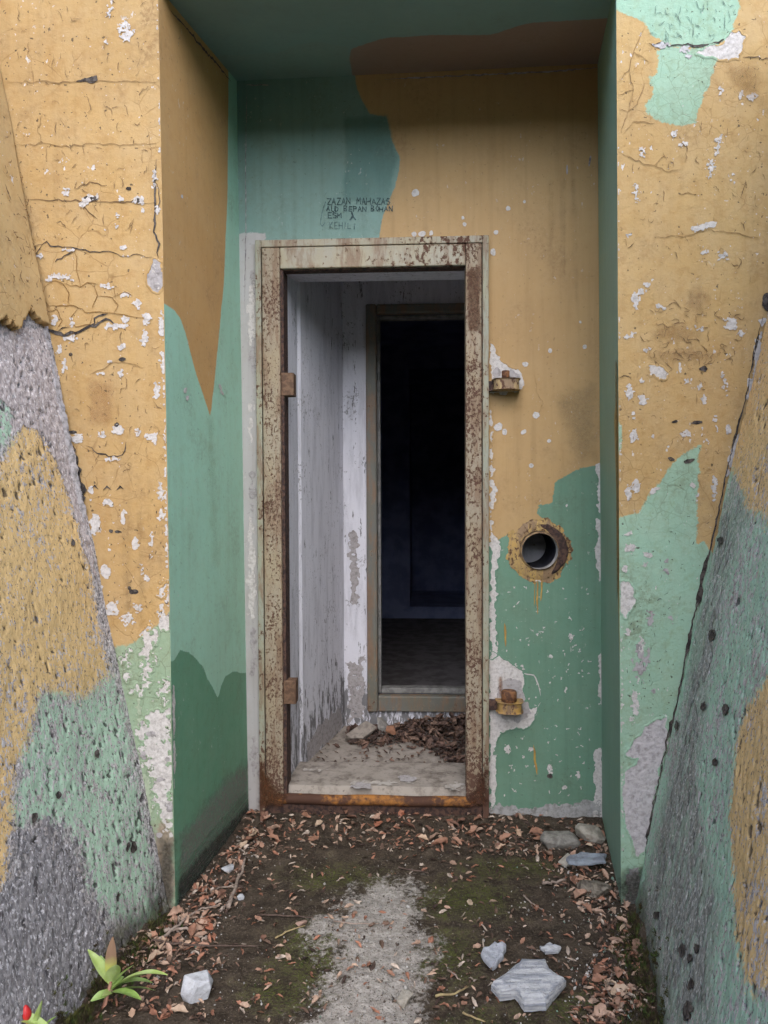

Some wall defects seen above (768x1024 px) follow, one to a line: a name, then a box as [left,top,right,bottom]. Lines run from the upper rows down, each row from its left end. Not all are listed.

crack [618,1,765,278]
crack [5,0,169,616]
corrosion [468,268,480,331]
peeling [0,812,113,1024]
spalling [0,315,127,588]
peeling [98,420,176,841]
corrosion [259,764,286,806]
corrosion [465,769,487,807]
peeling [489,408,602,818]
corrosion [540,524,568,574]
peeling [620,497,741,1021]
crack [627,300,763,854]